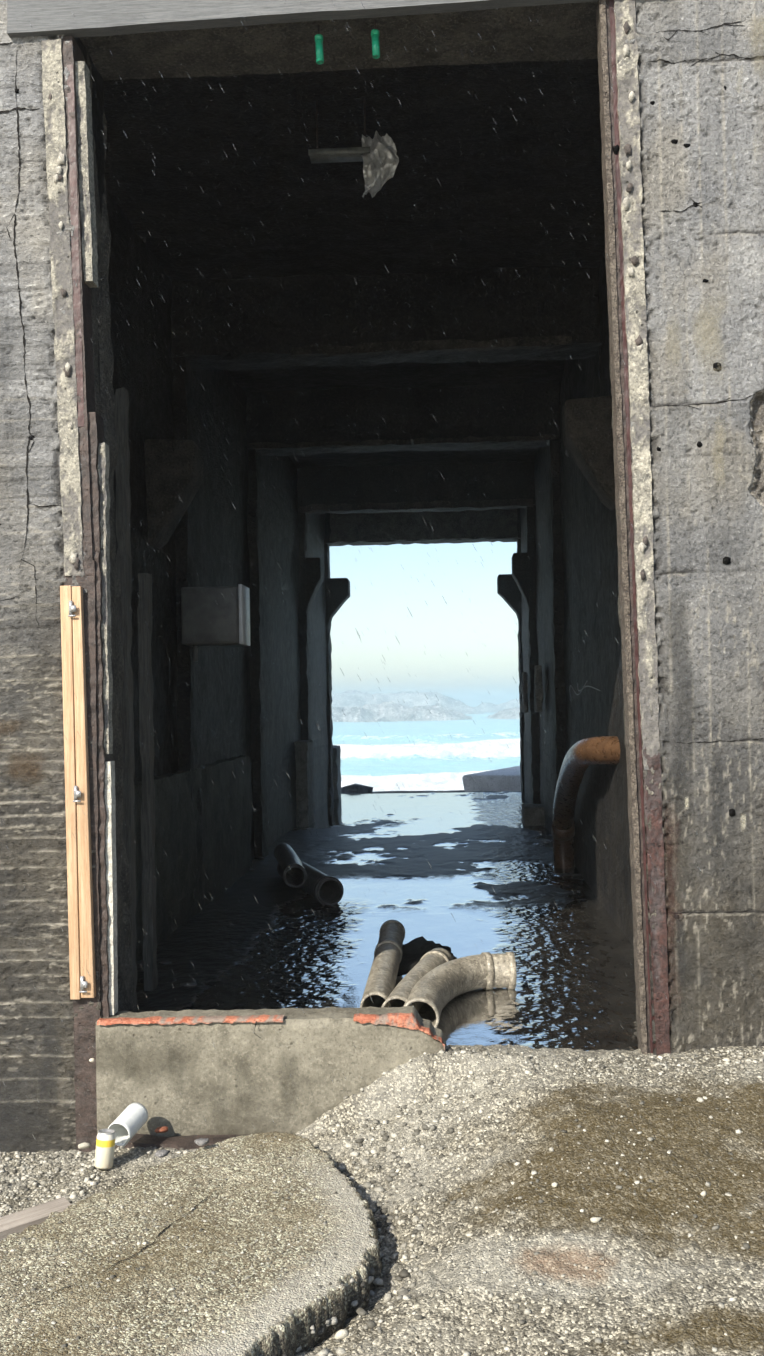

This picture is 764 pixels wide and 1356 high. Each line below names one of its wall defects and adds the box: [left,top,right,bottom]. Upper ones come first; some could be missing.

crack [647,21,764,66]
crack [662,200,705,213]
crack [0,42,59,625]
spalling [748,390,764,506]